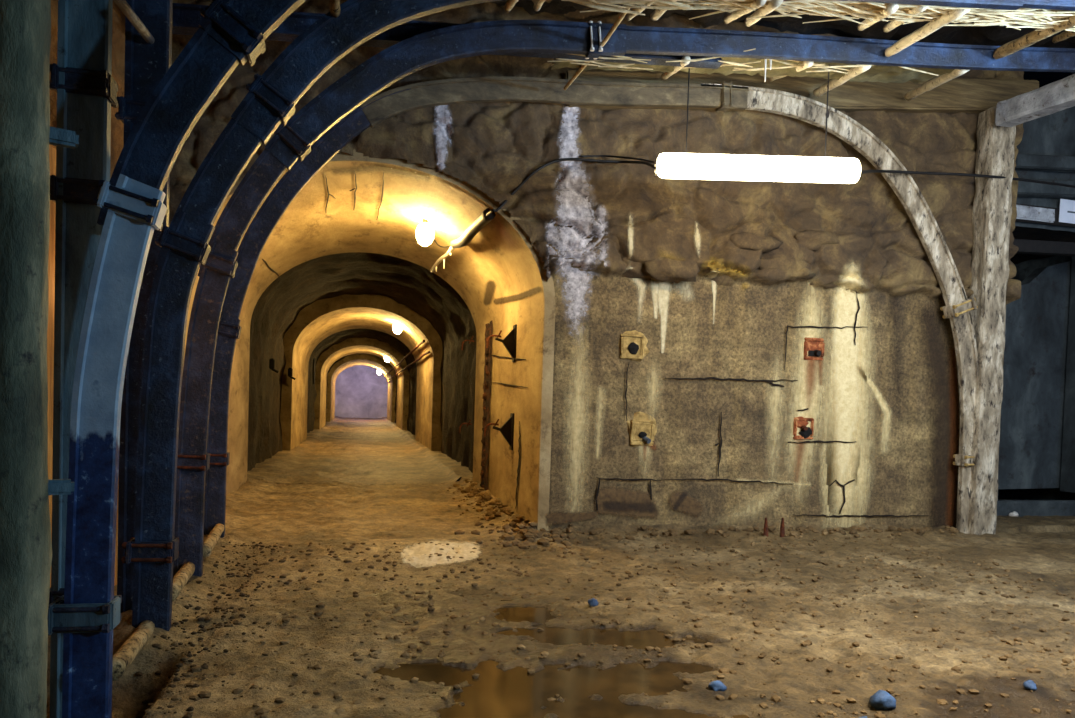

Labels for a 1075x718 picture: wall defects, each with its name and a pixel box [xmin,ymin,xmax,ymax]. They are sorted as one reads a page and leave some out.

water stain [333,105,515,246]
water stain [547,106,607,334]
corrosion [808,356,822,391]
crack [793,479,928,517]